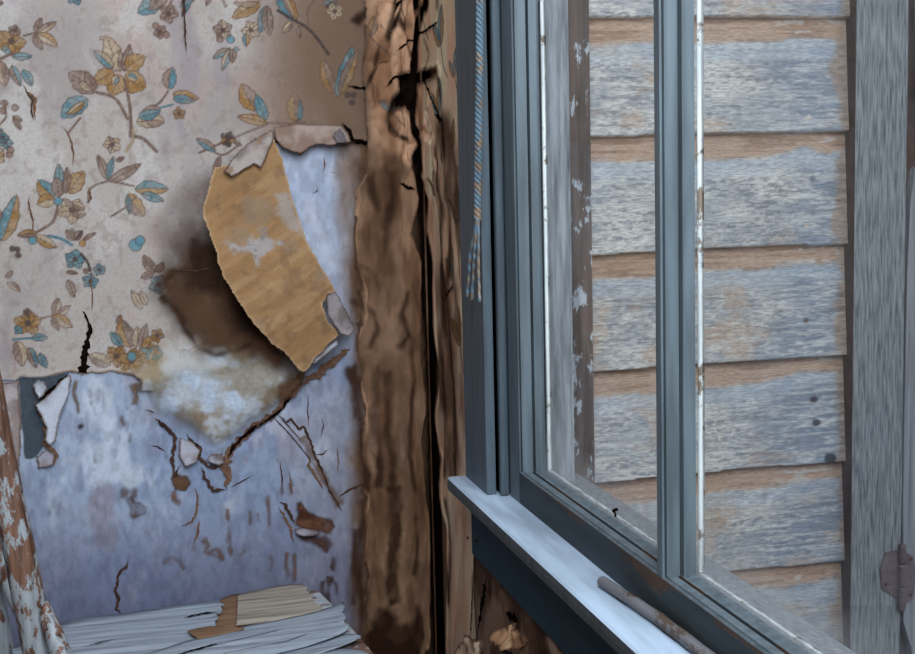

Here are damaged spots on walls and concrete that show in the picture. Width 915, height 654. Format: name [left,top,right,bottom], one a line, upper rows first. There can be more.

peeling [275,124,350,154]
crack [342,123,368,145]
crack [77,268,93,373]
leakage [159,227,288,371]
crack [349,0,453,654]
peeling [3,372,72,469]
crack [274,402,339,474]
flaking render [171,474,190,504]
crack [182,489,200,543]
crack [280,463,293,495]
flaking render [279,502,334,552]
crack [114,562,129,613]